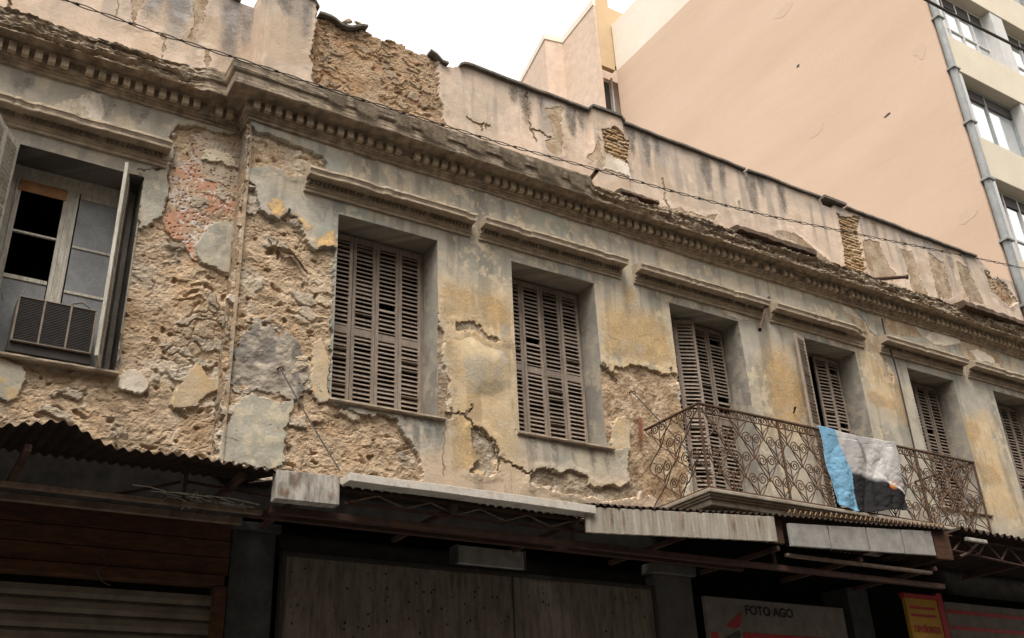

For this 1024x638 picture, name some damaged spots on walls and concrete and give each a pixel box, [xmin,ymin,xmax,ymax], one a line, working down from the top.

flaking render [310,17,443,125]
crack [524,92,552,141]
flaking render [587,128,629,162]
spalling [0,124,420,482]
flaking render [837,215,1014,306]
crack [442,406,527,475]
spalling [529,365,689,505]